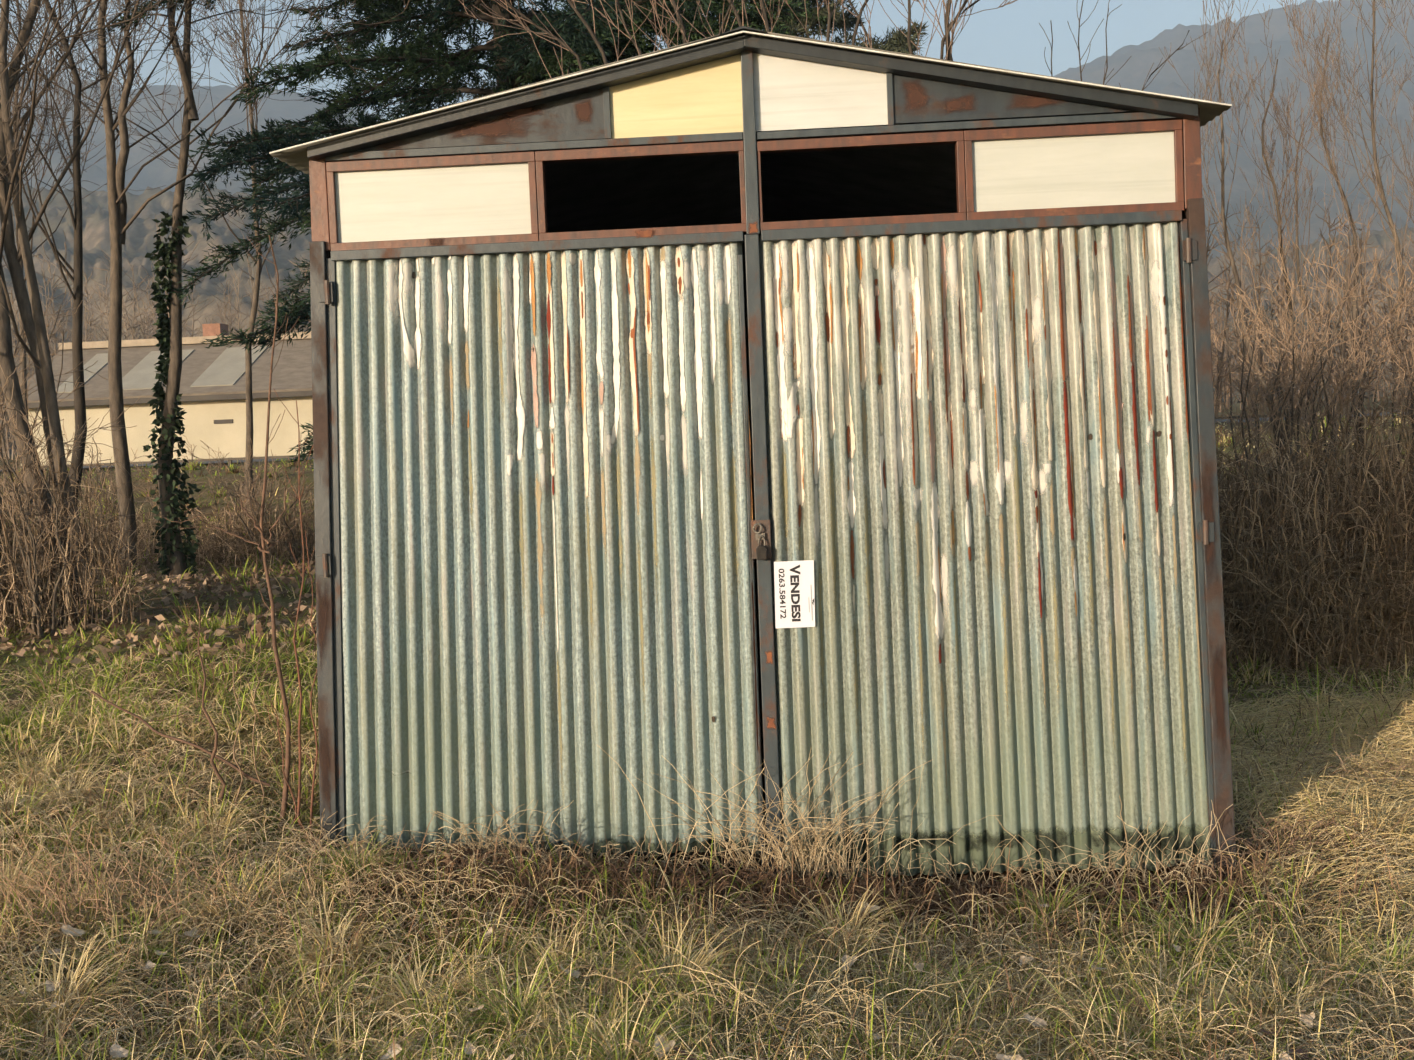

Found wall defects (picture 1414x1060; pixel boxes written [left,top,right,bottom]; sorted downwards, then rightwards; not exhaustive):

rust [451,104,544,138]
rust [575,99,592,122]
rust [904,82,973,113]
rust [1013,96,1058,108]
peeling [387,255,473,513]
peeling [497,249,644,761]
rust [635,230,653,399]
peeling [772,232,1059,732]
rust [1058,228,1094,624]
peeling [1092,228,1128,581]
peeling [1109,581,1133,725]